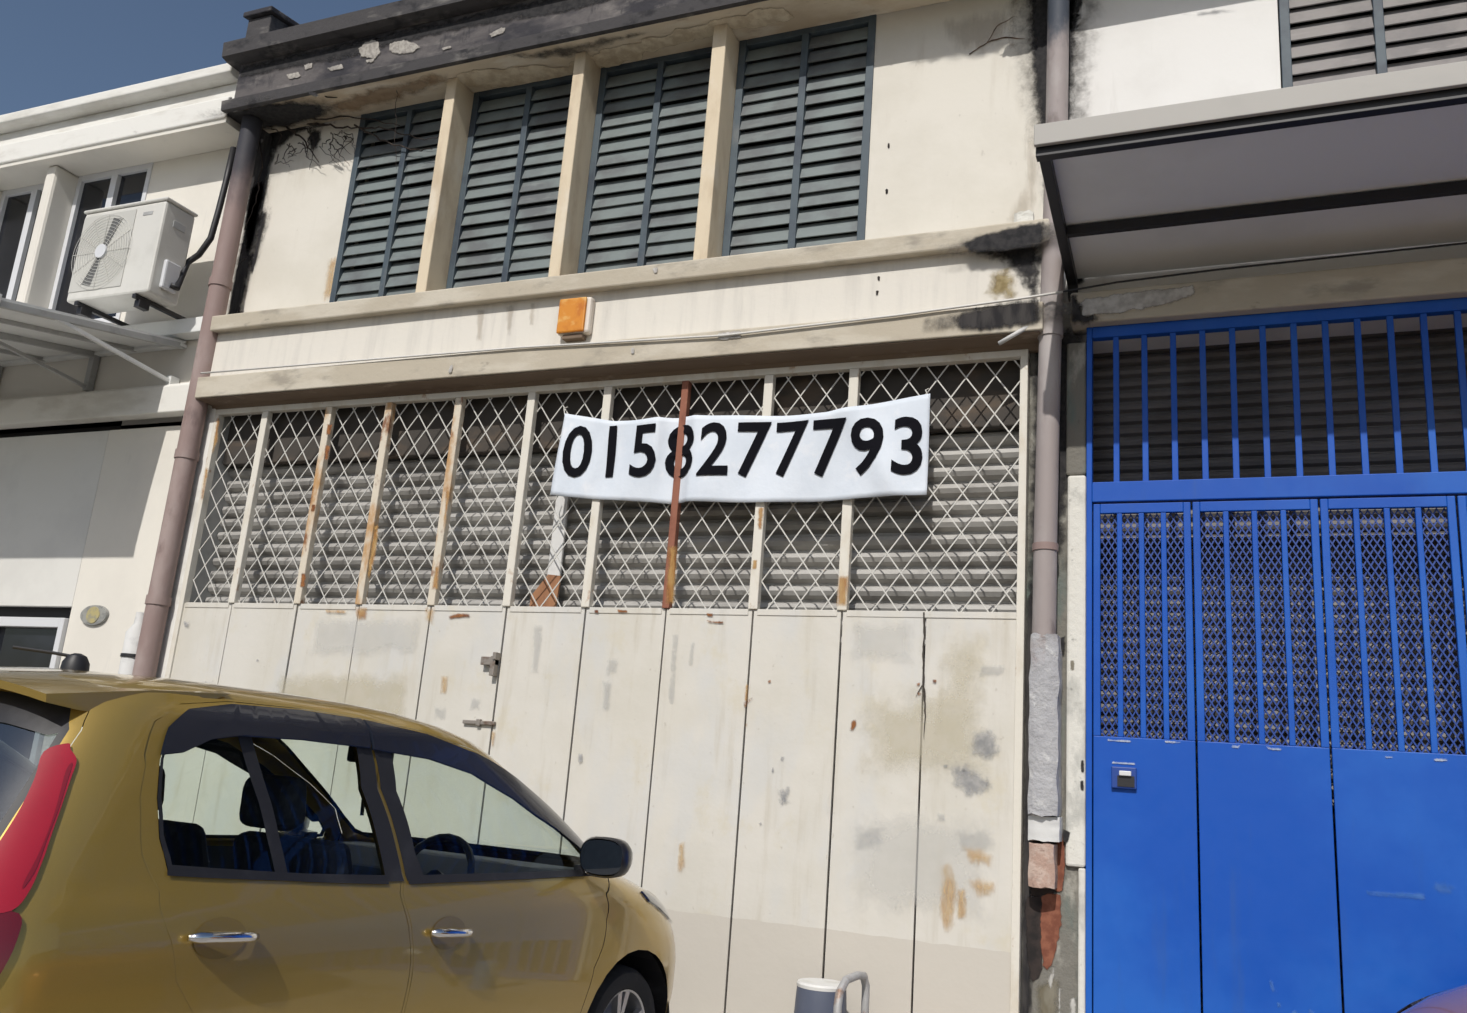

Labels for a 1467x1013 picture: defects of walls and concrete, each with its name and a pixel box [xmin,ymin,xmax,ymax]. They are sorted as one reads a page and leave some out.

water stain [1026,0,1048,124]
water stain [1068,0,1083,116]
water stain [221,75,441,314]
water stain [941,222,1098,559]
corrosion [667,548,675,602]
spalling [1025,838,1065,981]